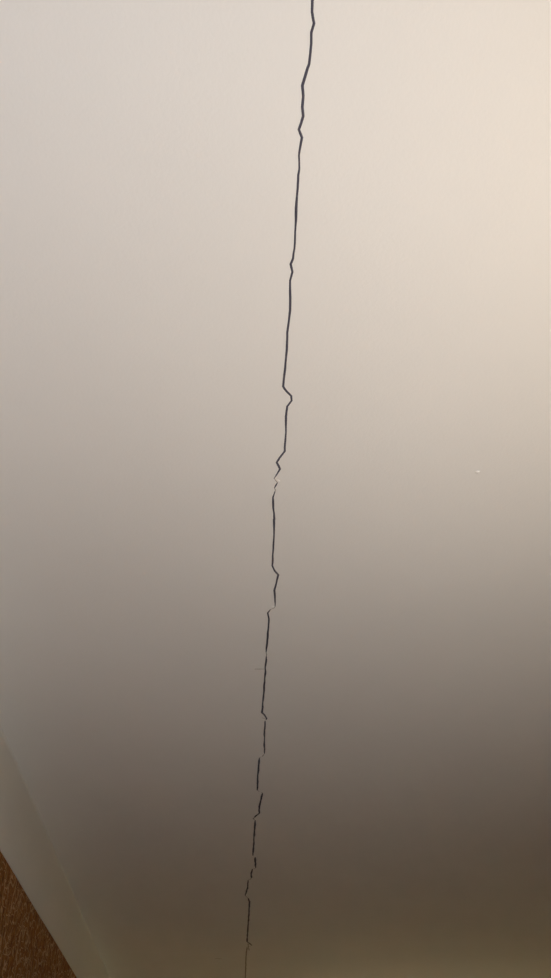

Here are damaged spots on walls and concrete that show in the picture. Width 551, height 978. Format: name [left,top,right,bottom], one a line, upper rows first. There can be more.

crack [245,0,315,978]